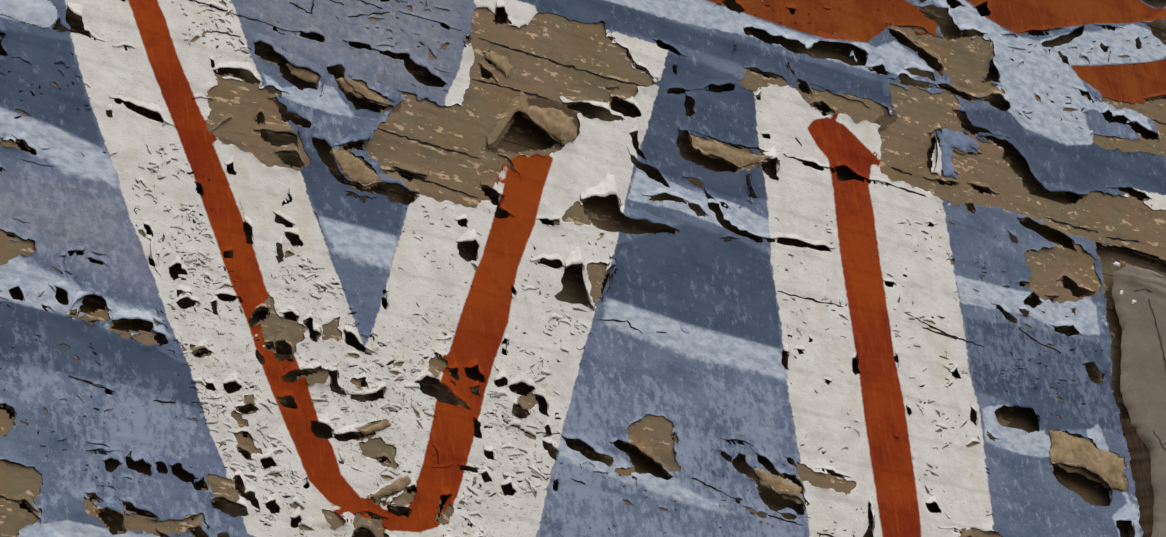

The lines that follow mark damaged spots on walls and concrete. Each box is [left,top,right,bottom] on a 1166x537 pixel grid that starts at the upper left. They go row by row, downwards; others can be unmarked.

peeling [0,0,106,76]
peeling [14,51,92,119]
peeling [0,132,54,166]
peeling [172,0,1166,338]
peeling [0,141,683,537]
peeling [883,267,945,367]
crack [1129,260,1166,370]
peeling [907,366,1000,449]
peeling [712,430,857,519]
peeling [1051,457,1112,503]
peeling [1116,509,1135,537]